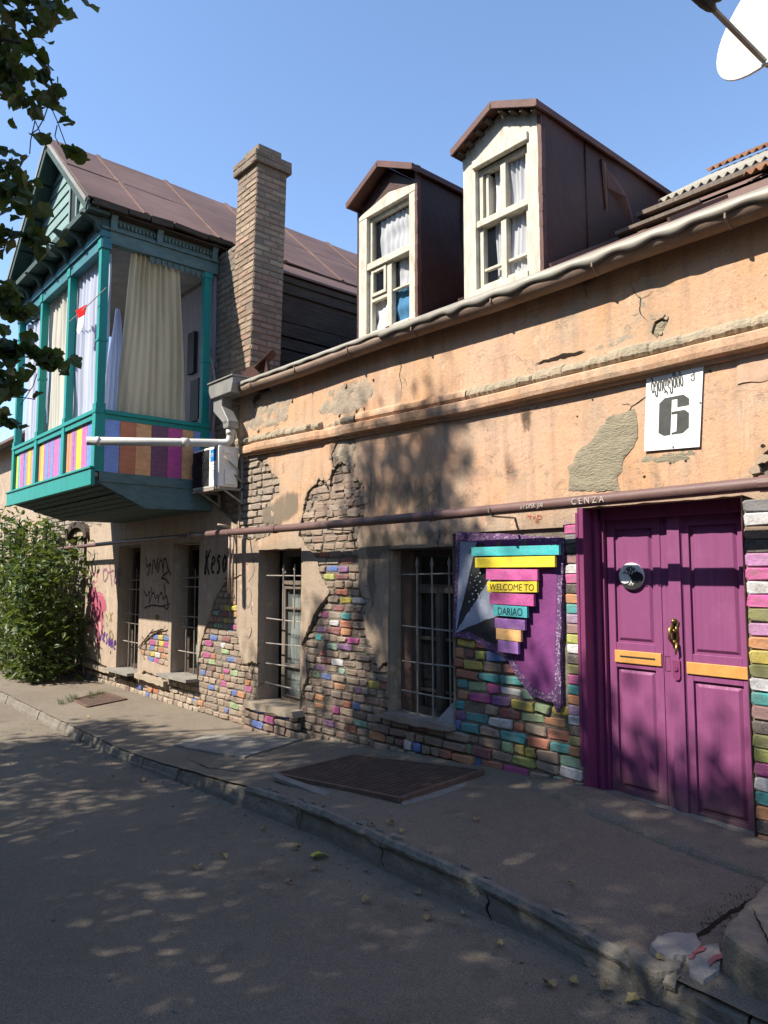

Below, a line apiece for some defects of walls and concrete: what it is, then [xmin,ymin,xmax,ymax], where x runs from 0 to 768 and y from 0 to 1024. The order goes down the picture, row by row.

spalling [638,289,668,338]
spalling [234,453,280,541]
spalling [301,438,369,535]
crack [484,891,492,920]
crack [696,897,768,943]